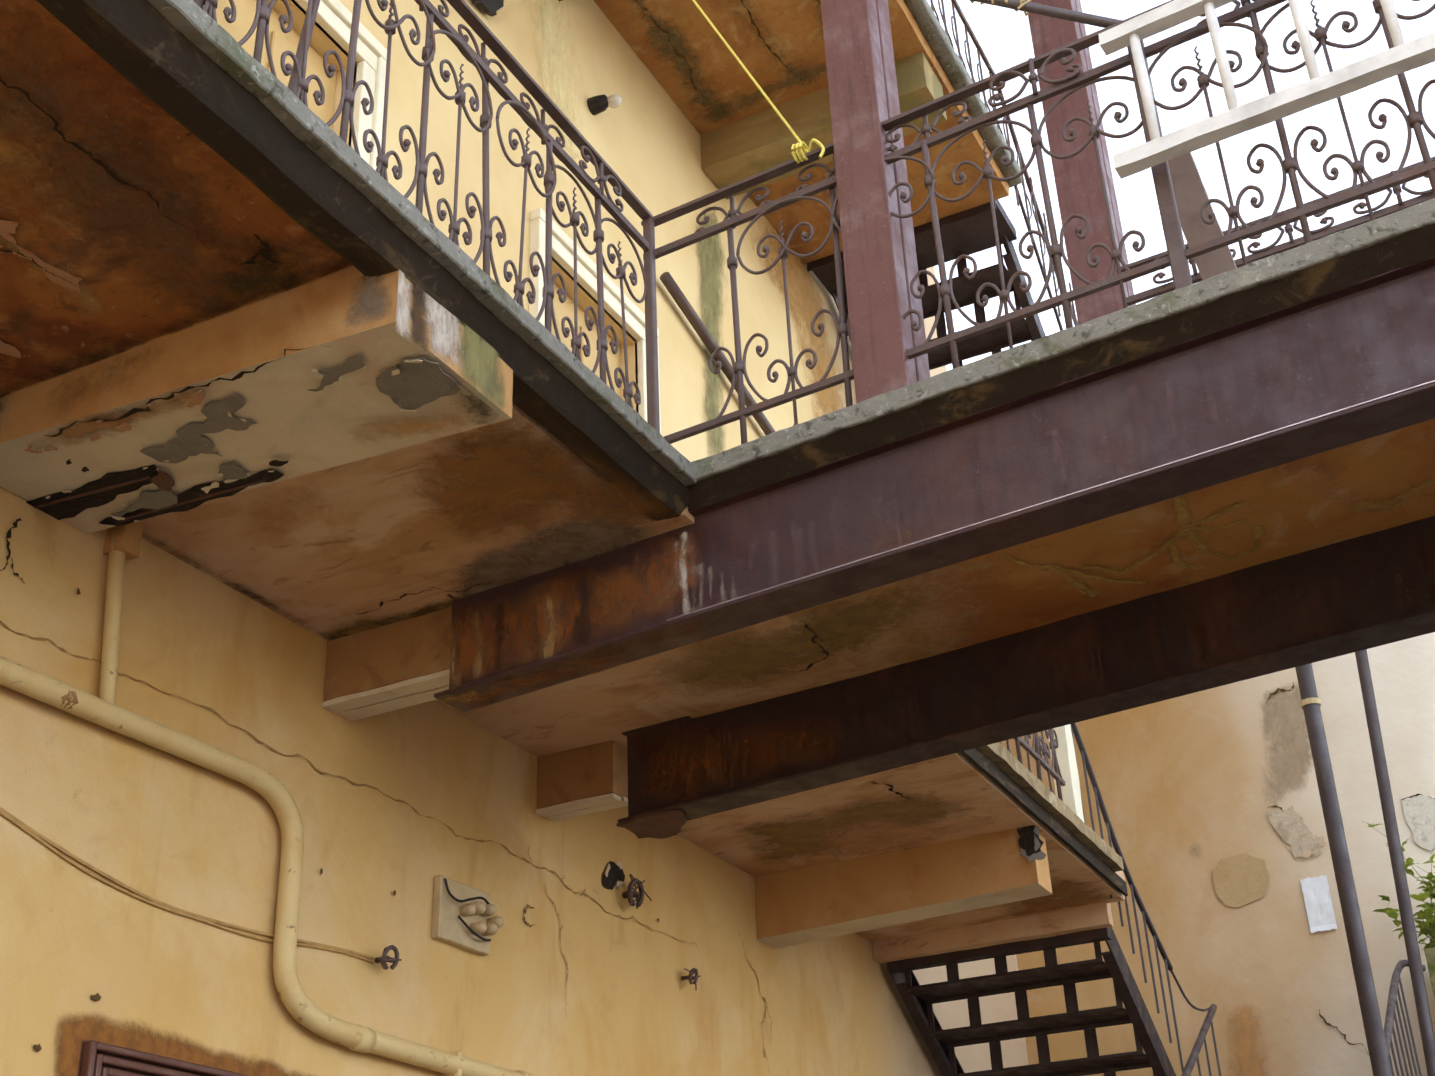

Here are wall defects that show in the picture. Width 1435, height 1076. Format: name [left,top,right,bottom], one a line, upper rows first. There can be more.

crack [0,79,283,265]
peeling [0,220,99,310]
peeling [0,340,21,358]
peeling [308,355,461,412]
spalling [25,390,289,526]
crack [0,518,25,583]
crack [359,575,500,615]
water stain [329,425,658,641]
corrosion [449,539,696,688]
crack [0,620,704,1018]
spalling [1266,805,1325,859]
crack [1319,1010,1369,1055]